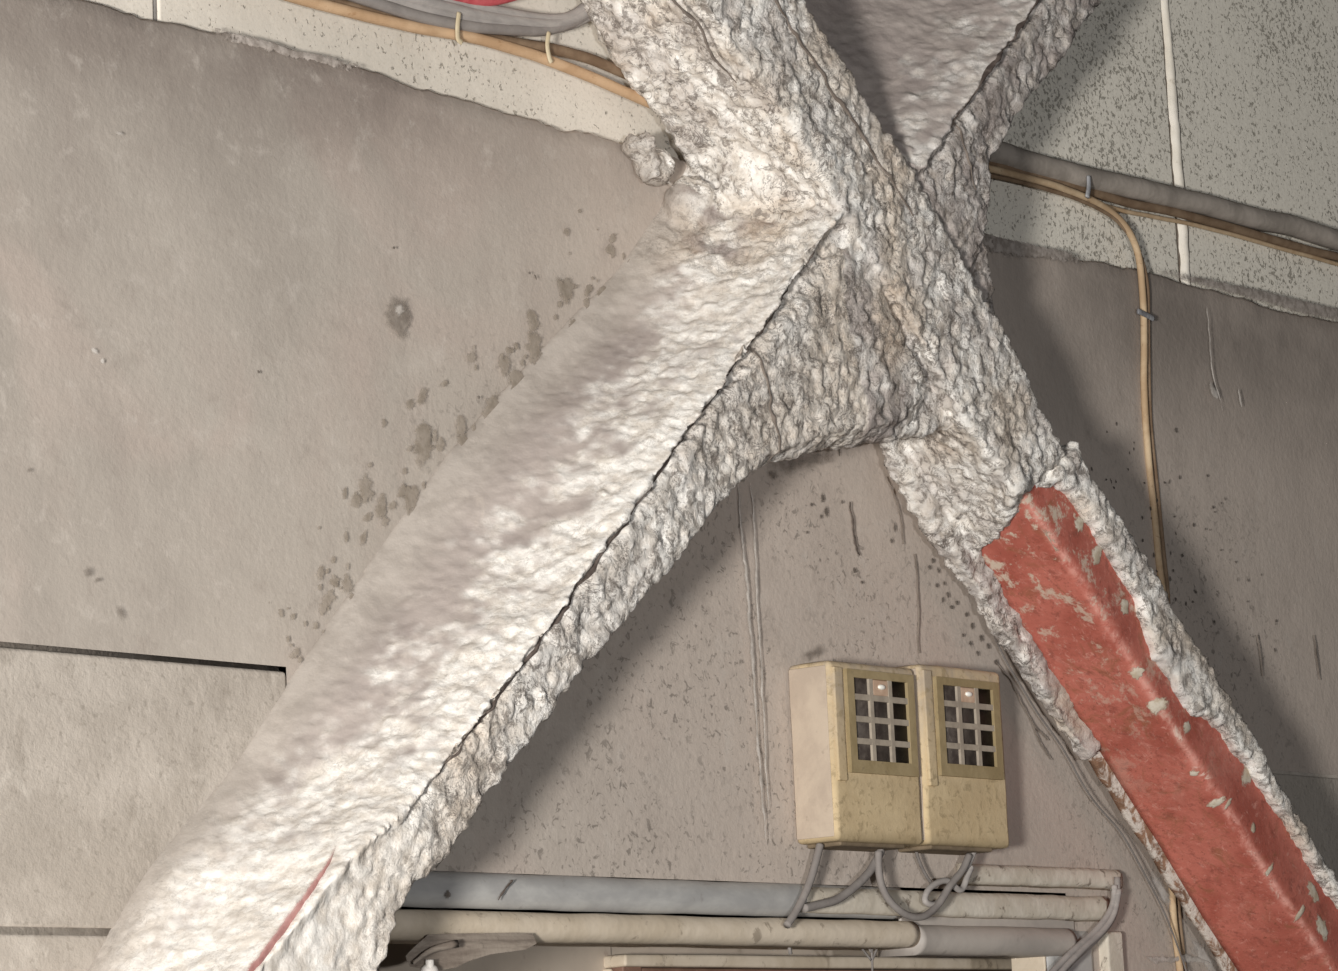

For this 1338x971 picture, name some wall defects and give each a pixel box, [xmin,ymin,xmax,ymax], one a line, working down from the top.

crack [438,240,821,775]
peeling [1092,546,1102,565]
peeling [1130,667,1145,680]
peeling [1147,698,1168,715]
peeling [1241,765,1251,784]
peeling [1207,796,1231,809]
peeling [1294,881,1328,940]